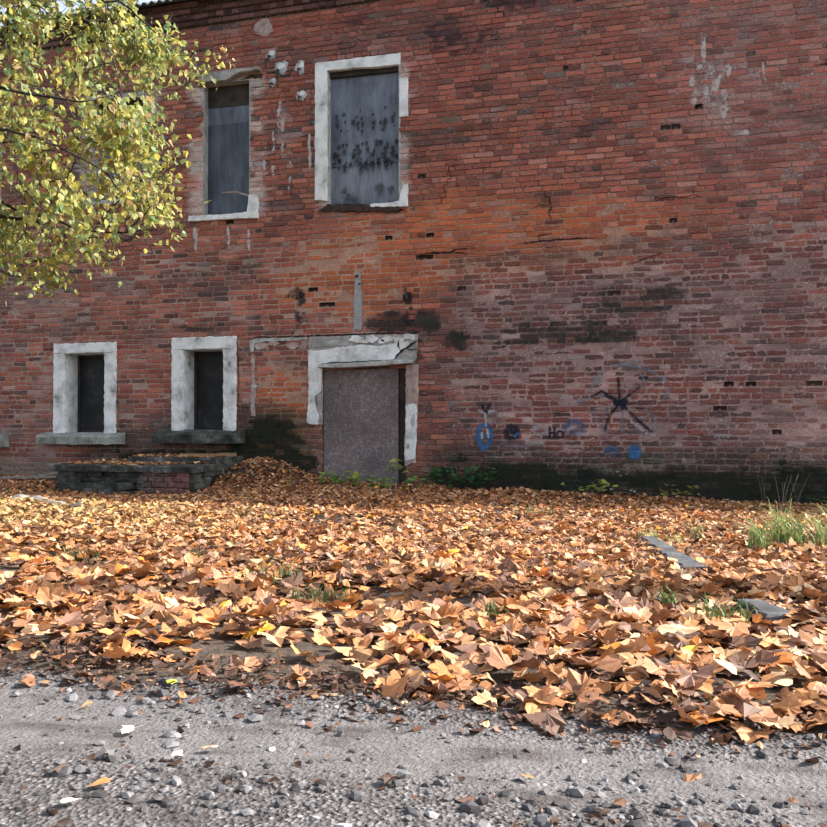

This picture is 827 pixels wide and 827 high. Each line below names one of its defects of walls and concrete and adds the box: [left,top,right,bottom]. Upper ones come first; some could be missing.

damp [689,38,732,118]
crack [436,160,460,209]
crack [516,196,597,245]
peeling [249,333,415,424]